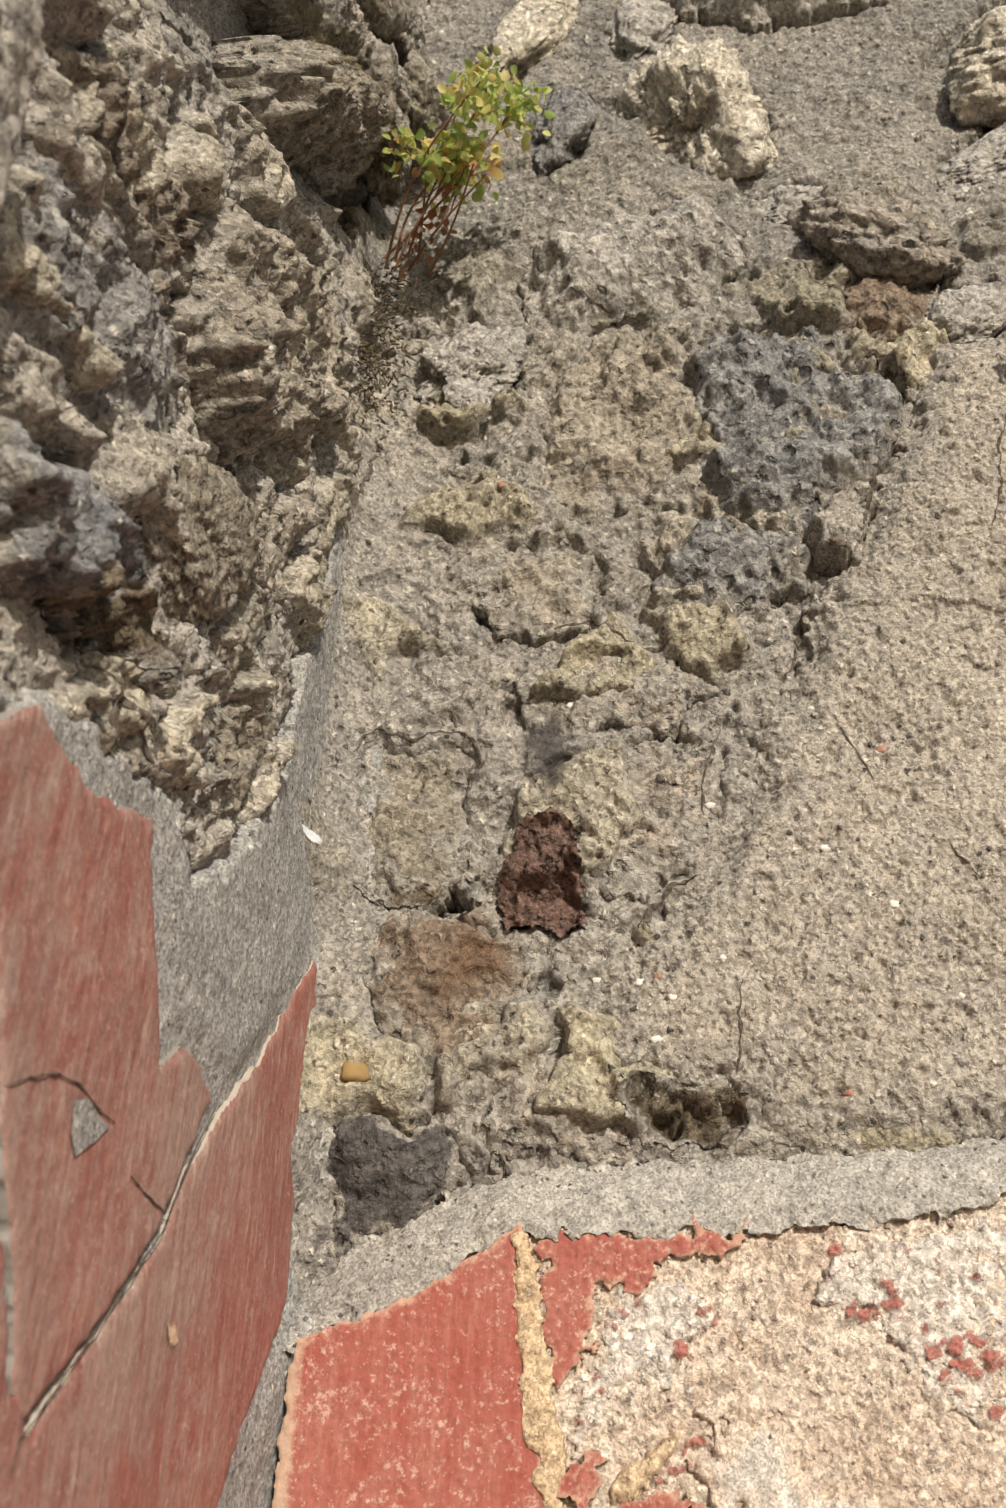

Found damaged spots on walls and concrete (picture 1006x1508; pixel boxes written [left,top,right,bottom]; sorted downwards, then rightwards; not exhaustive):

crack [4,1072,115,1124]
spalling [71,1099,109,1156]
crack [10,1102,218,1477]
spalling [556,1280,725,1508]
spalling [812,1214,1006,1429]